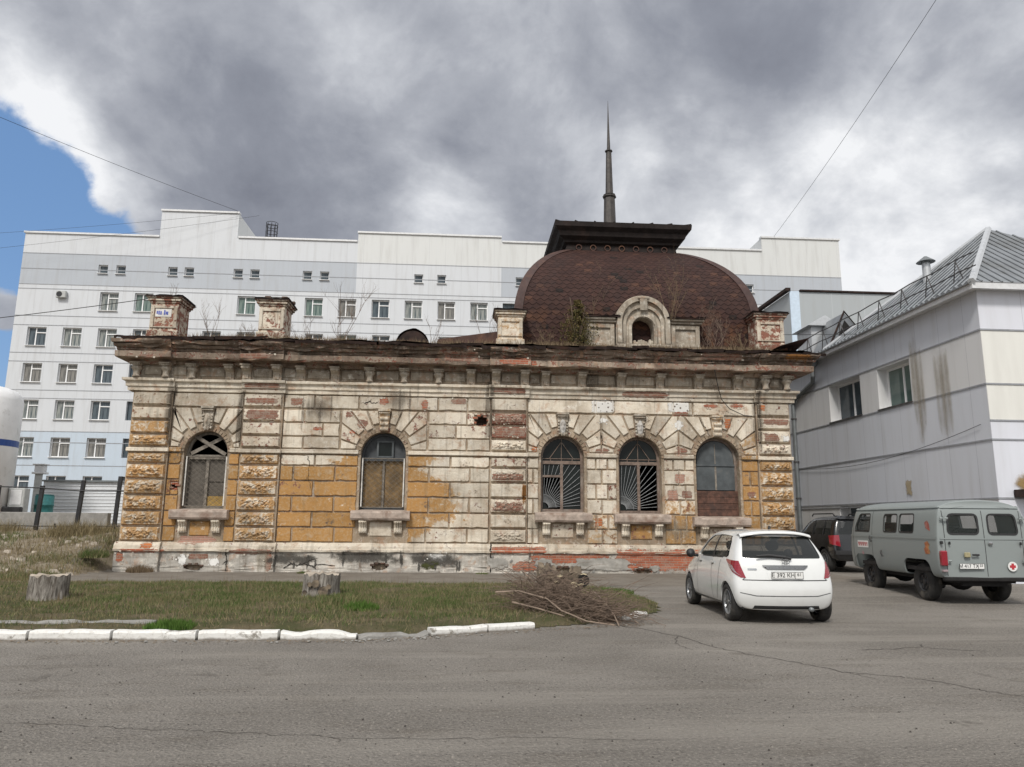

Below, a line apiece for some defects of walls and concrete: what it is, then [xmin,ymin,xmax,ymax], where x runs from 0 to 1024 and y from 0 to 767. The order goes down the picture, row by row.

flaking render [239,351,276,359]
flaking render [473,414,539,452]
flaking render [758,403,790,444]
damp [267,554,316,568]
damp [332,551,460,571]
flaking render [490,546,711,573]